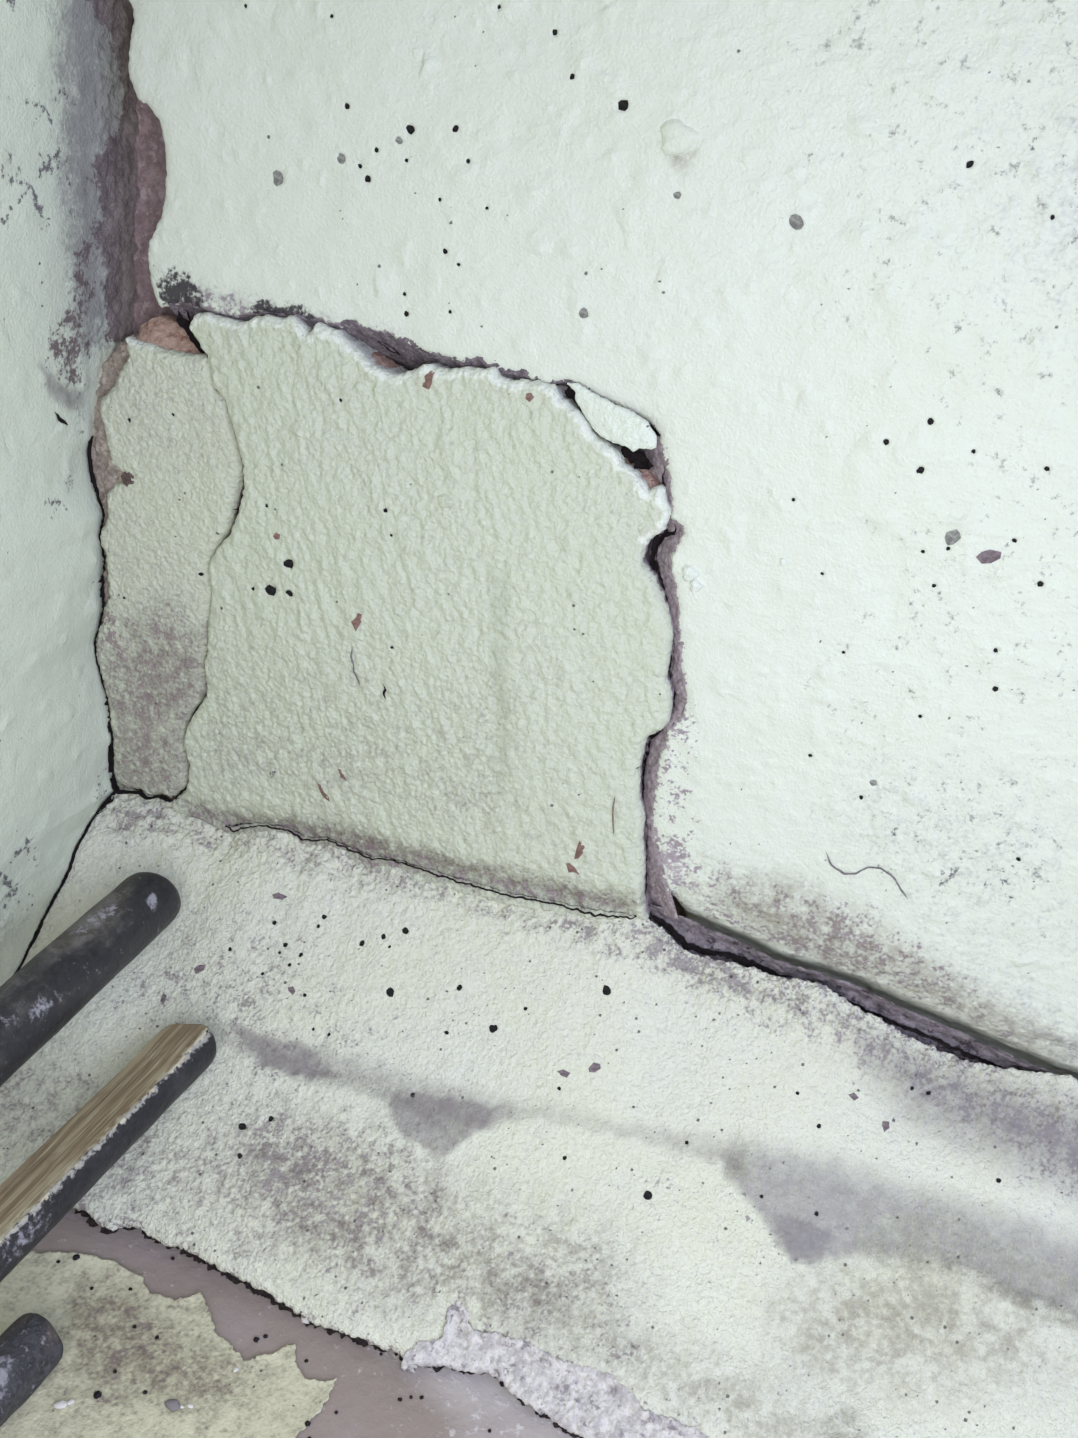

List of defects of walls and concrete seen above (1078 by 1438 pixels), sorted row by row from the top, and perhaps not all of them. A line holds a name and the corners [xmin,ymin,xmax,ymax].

spalling [91,98,687,919]
crack [225,525,1055,1074]
peeling [0,1251,337,1438]
spalling [399,1300,710,1438]